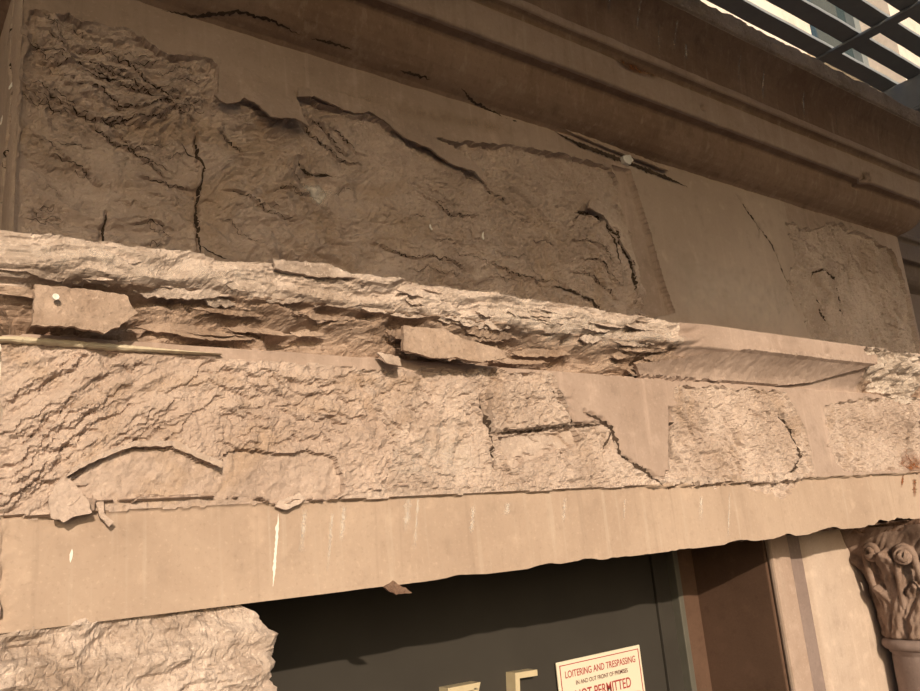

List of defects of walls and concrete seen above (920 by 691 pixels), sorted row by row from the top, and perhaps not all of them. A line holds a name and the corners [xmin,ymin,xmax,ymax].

crack [400,70,430,80]
crack [461,88,517,122]
crack [100,213,108,241]
crack [183,136,227,259]
crack [298,161,332,177]
spalling [0,9,920,527]
crack [554,286,600,310]
crack [576,211,638,302]
crack [557,133,687,187]
crack [743,204,843,321]
crack [479,391,664,486]
spalling [0,604,278,691]